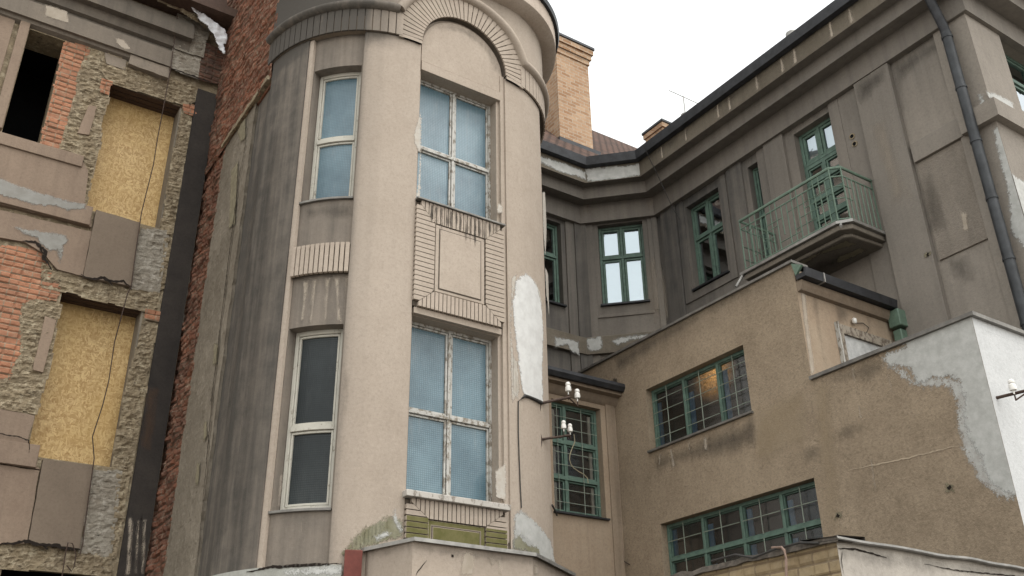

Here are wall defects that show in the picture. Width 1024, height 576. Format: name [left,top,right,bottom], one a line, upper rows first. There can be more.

flaking render [0,13,210,576]
peeling [510,269,647,401]
peeling [513,510,556,563]